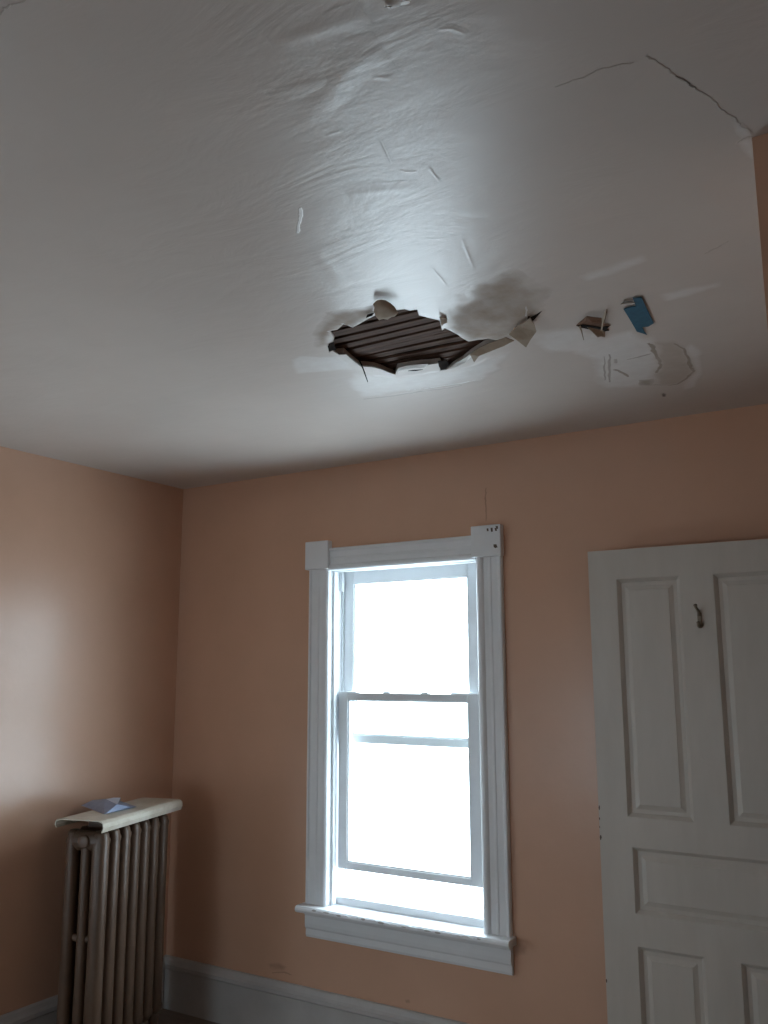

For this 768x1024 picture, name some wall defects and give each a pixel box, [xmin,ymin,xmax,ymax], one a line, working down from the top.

crack [555,54,755,159]
peeling [328,309,514,375]
peeling [533,326,705,397]